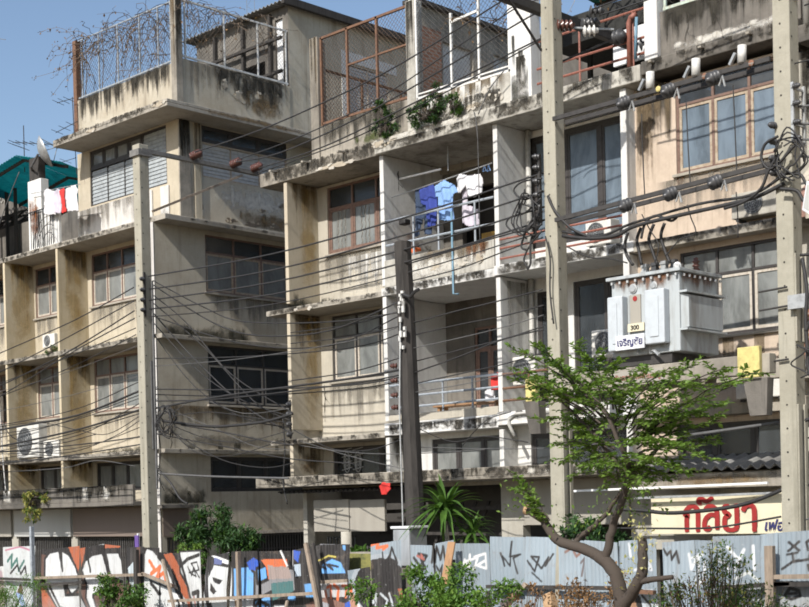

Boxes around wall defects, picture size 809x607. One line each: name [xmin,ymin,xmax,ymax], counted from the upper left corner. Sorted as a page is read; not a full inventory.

damp [664,0,773,61]
damp [80,63,169,116]
damp [112,101,157,122]
damp [209,66,286,130]
damp [263,35,542,208]
mould [563,66,633,98]
damp [636,81,671,155]
damp [0,248,49,279]
damp [270,297,350,344]
damp [0,341,110,380]
damp [0,485,126,501]
damp [422,464,550,481]